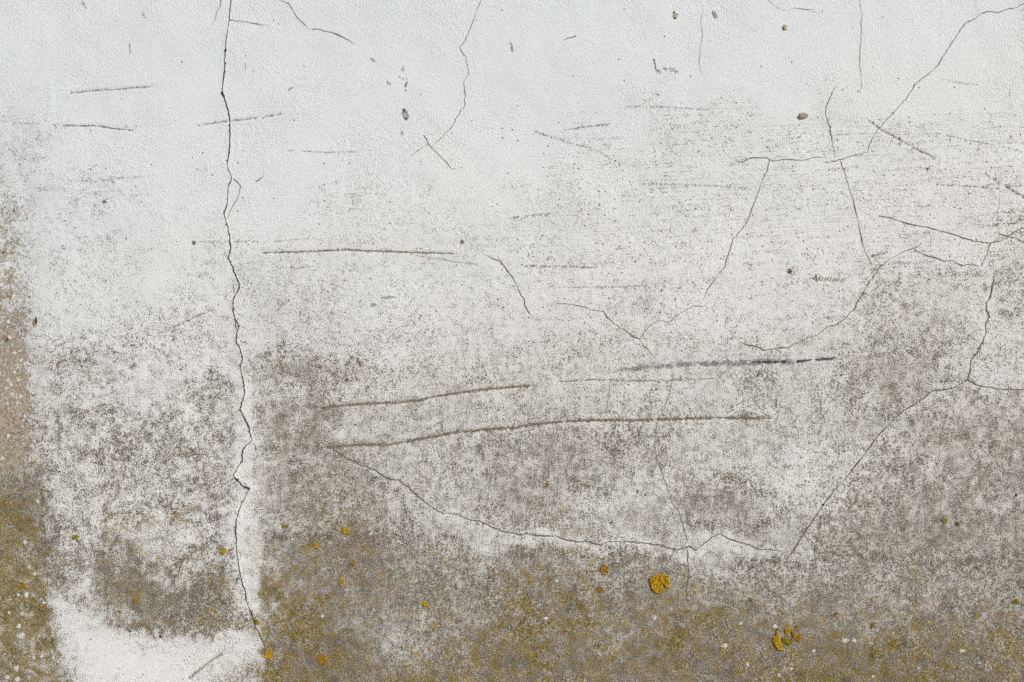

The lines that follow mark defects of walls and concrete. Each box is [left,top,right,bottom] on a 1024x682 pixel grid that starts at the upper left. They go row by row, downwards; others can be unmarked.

crack [212,3,267,650]
damp [0,208,1024,682]
crack [326,0,1024,616]